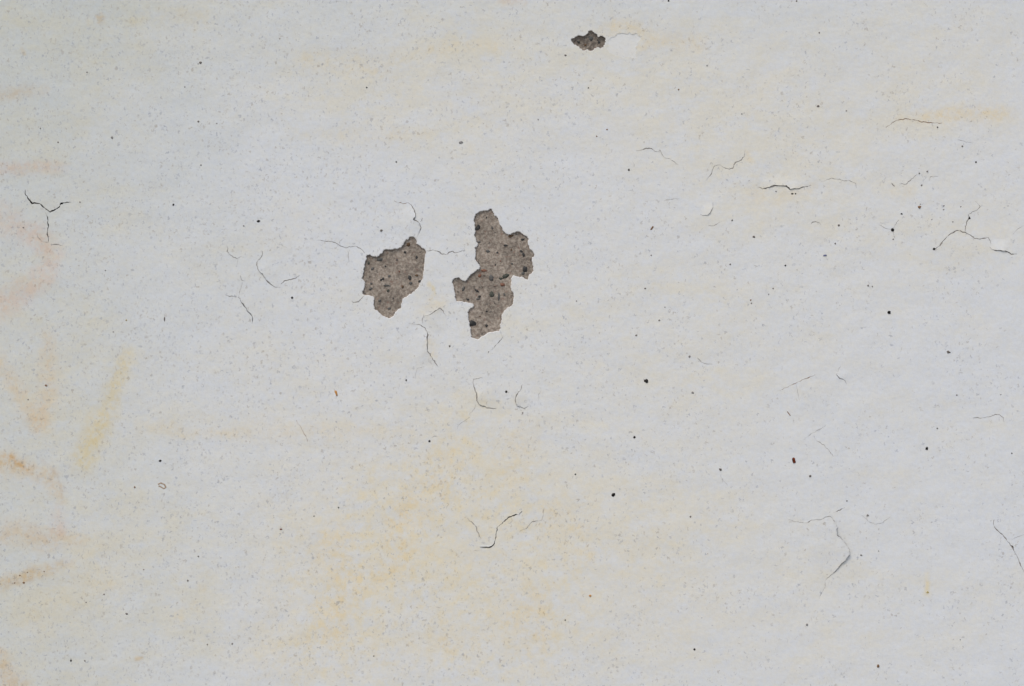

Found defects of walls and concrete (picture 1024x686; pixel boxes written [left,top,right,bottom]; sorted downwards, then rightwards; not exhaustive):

spalling [571,30,606,51]
crack [709,154,857,190]
crack [25,191,69,246]
crack [935,205,1019,255]
peeling [361,236,427,319]
peeling [452,208,535,340]
crack [471,511,544,551]